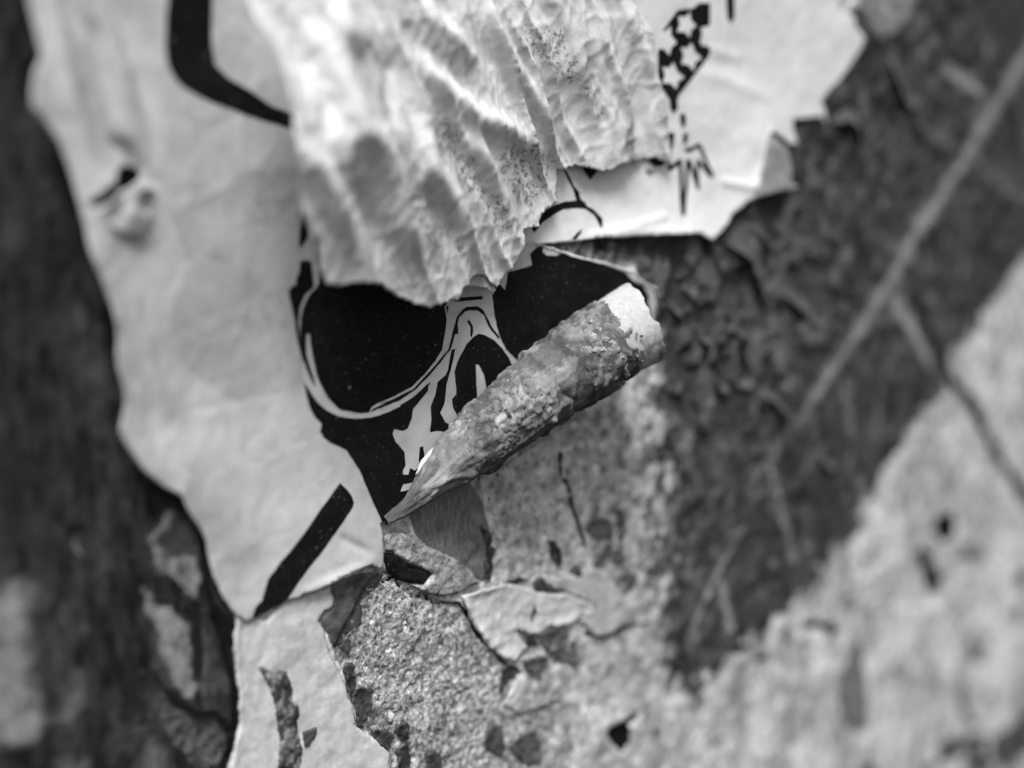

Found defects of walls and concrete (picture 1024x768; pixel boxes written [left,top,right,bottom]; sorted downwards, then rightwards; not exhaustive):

flaking render [580,317,630,391]
spalling [480,420,638,593]
spalling [319,571,579,768]
crack [380,576,521,674]
crack [583,621,650,639]